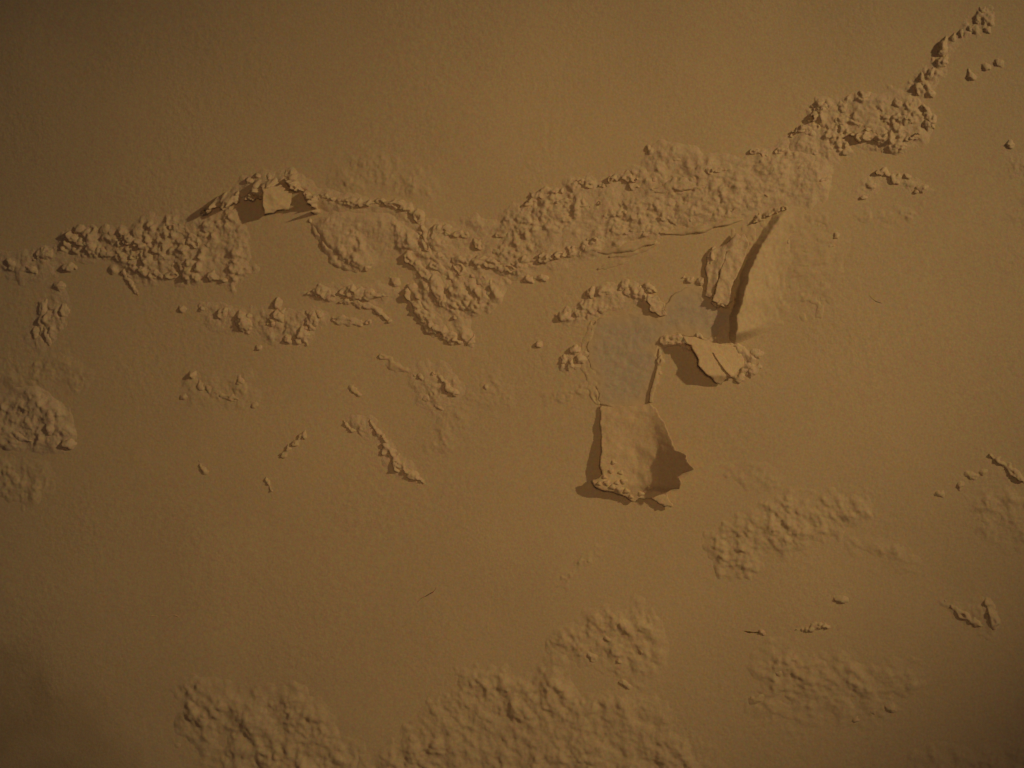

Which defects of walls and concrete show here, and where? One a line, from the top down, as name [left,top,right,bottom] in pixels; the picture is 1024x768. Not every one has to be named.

flaking render [0,164,676,354]
peeling [851,167,934,201]
flaking render [554,279,764,507]
peeling [938,596,1000,641]